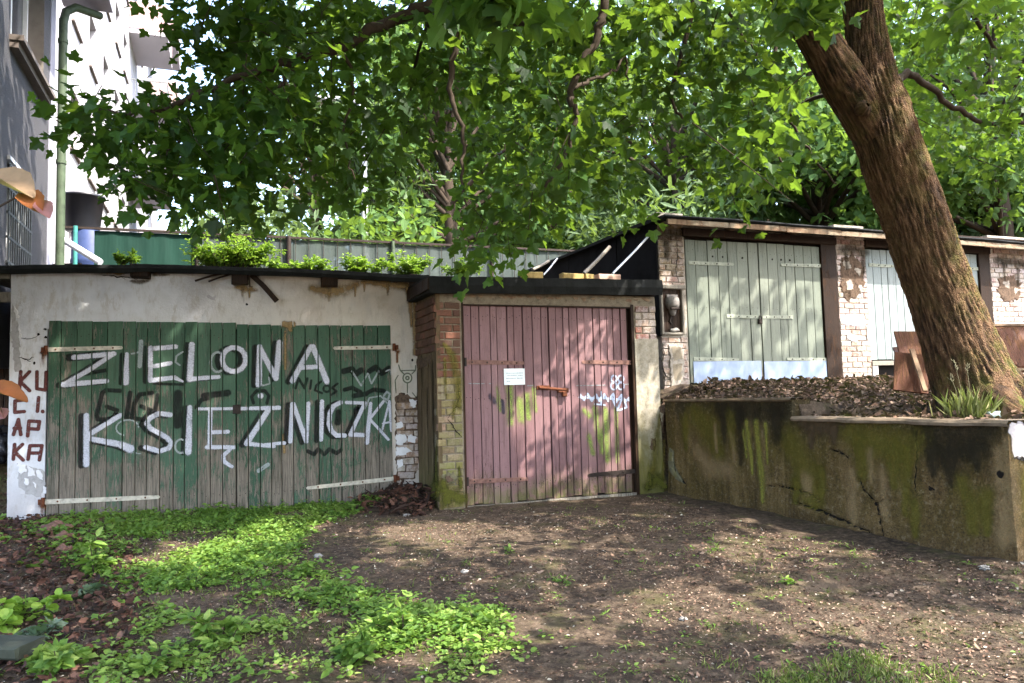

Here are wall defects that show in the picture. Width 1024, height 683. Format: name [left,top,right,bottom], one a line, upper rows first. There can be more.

spalling [839,254,866,302]
spalling [997,275,1023,302]
leakage [309,280,456,488]
flaking render [394,392,419,481]
leakage [715,401,786,475]
leakage [797,421,845,449]
leakage [914,415,996,486]
crack [770,481,888,536]